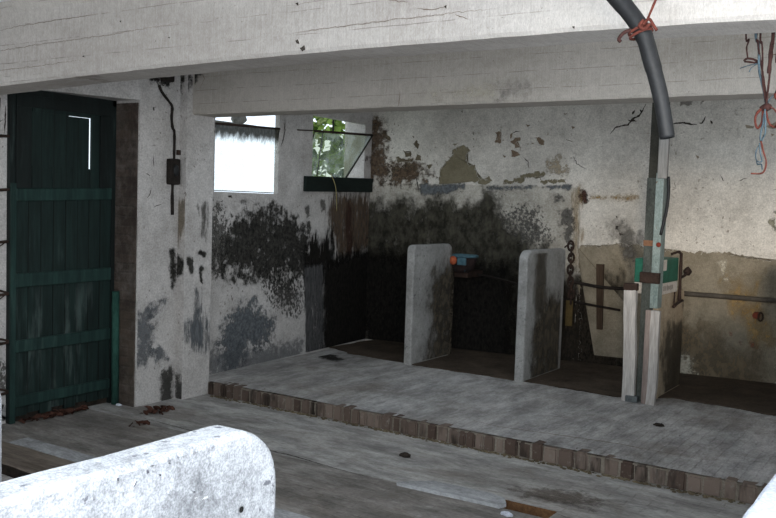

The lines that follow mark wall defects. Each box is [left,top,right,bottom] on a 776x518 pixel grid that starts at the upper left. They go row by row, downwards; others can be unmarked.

crack [610,104,646,134]
peeling [391,131,567,185]
water stain [420,183,465,196]
water stain [168,199,359,375]
water stain [137,298,182,401]